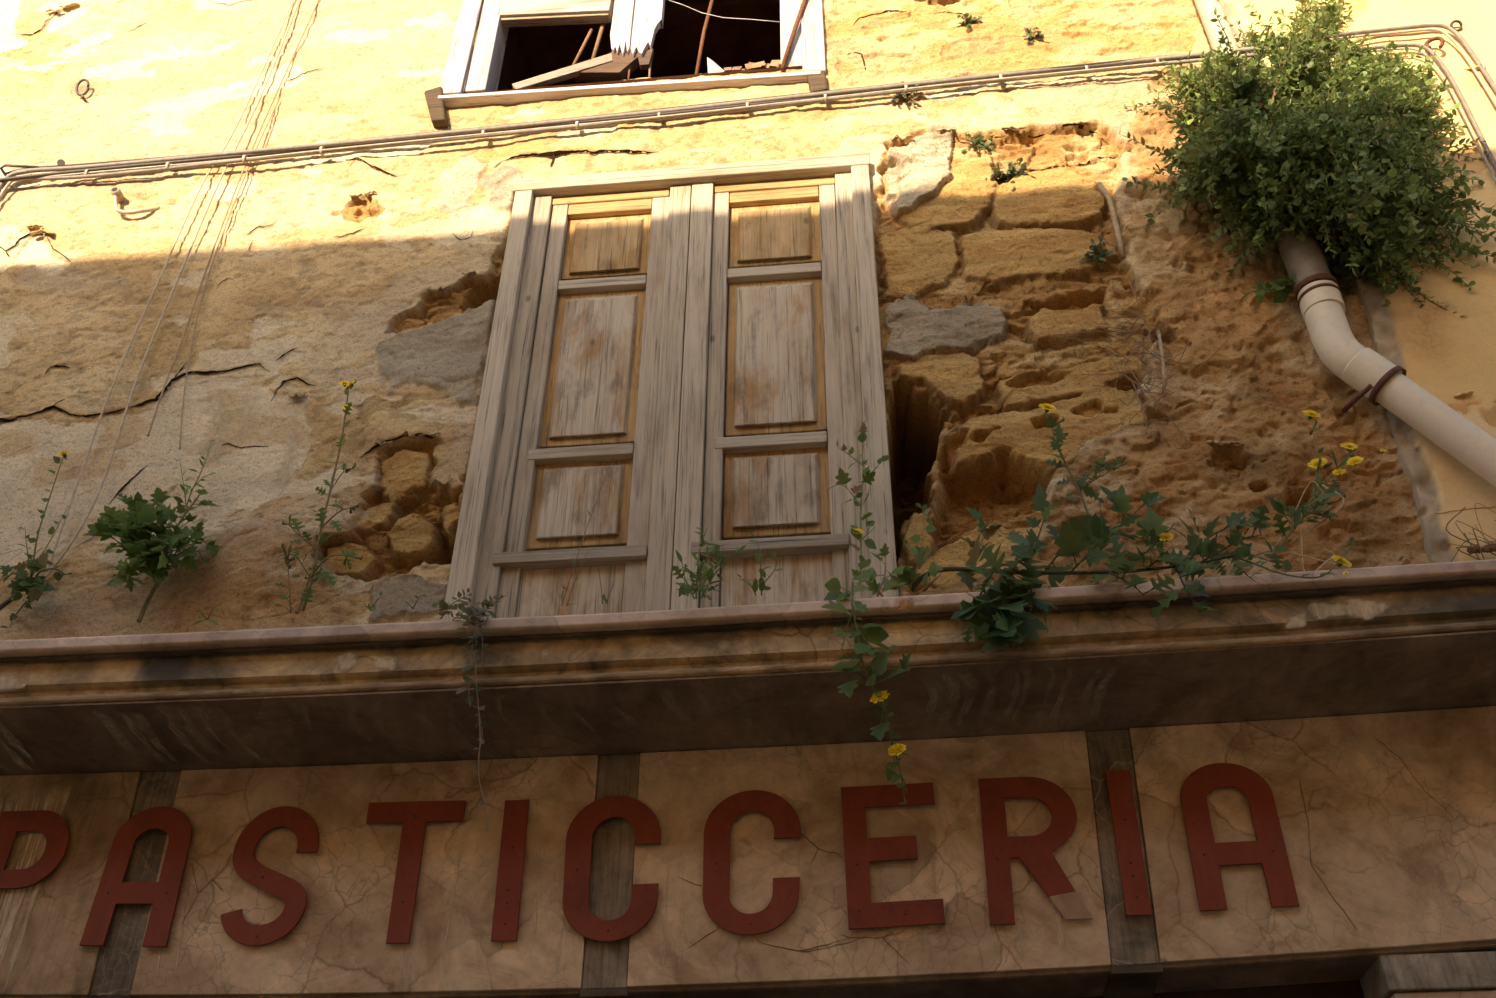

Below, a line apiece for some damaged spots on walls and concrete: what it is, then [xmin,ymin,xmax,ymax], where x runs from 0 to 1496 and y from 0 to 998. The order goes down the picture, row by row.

crack [495,149,657,167]
crack [0,219,70,261]
flaking render [336,190,384,223]
flaking render [386,247,504,334]
crack [0,348,315,423]
flaking render [873,120,1179,596]
flaking render [321,430,466,582]
crack [1299,779,1356,928]
crack [687,926,909,963]